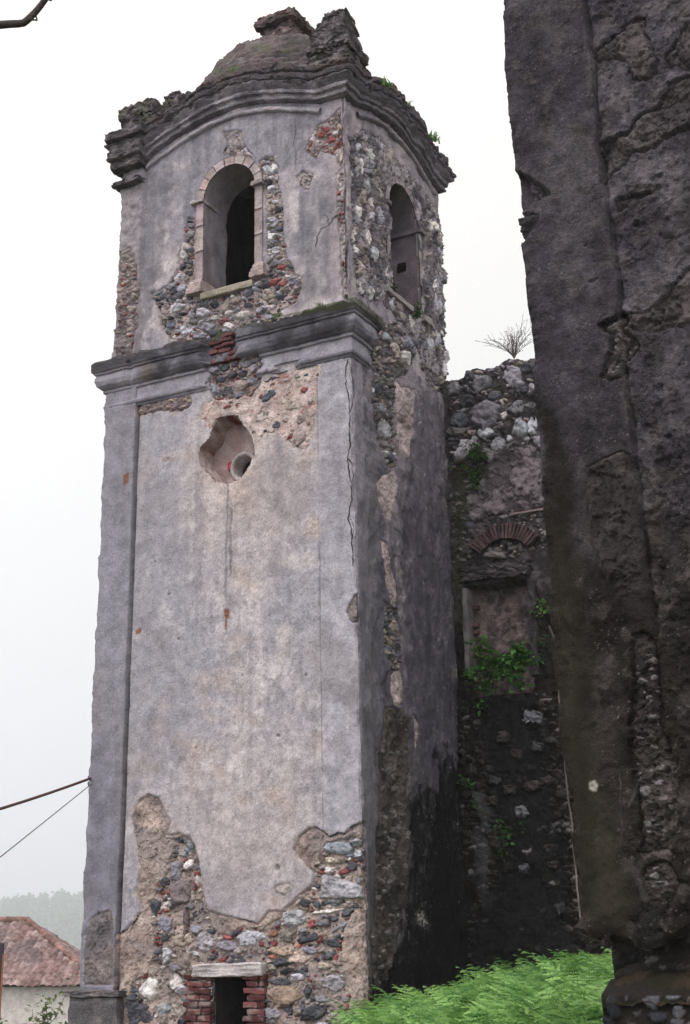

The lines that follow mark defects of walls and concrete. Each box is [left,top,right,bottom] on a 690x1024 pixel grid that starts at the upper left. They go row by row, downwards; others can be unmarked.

spalling [83,109,450,1024]
crack [315,213,338,247]
crack [345,359,354,565]
water stain [369,407,598,1006]